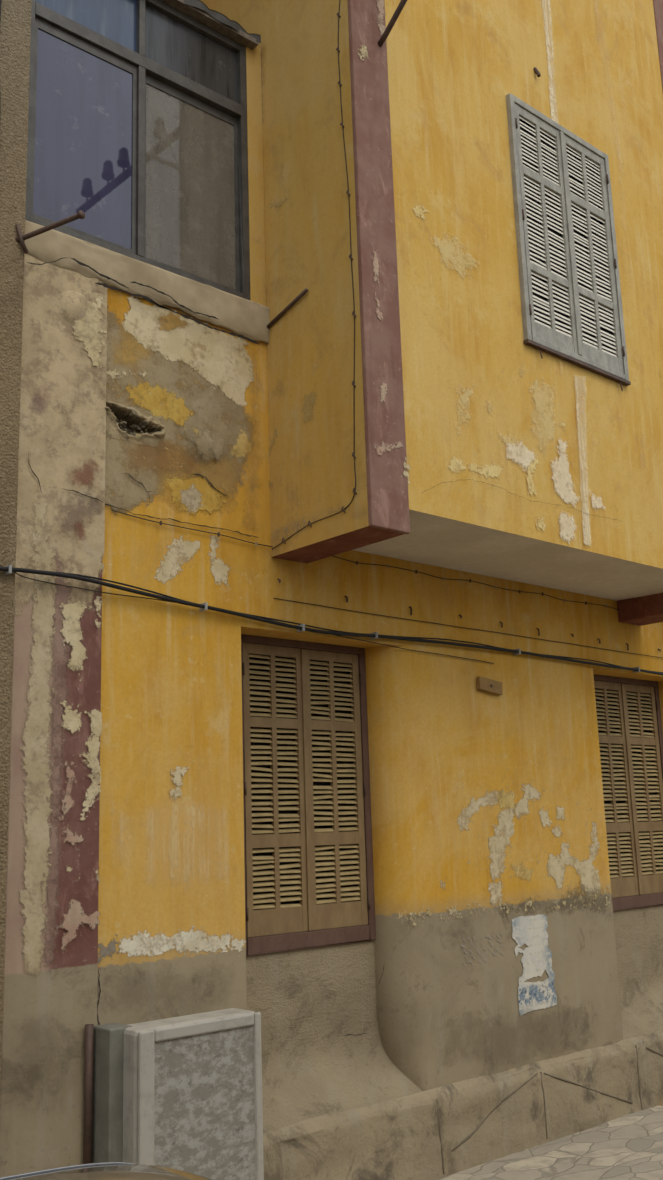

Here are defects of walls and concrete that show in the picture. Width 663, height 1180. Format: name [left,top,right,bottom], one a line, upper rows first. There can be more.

peeling [376,0,386,42]
peeling [433,234,481,278]
crack [28,452,259,538]
peeling [435,366,613,544]
peeling [14,253,254,976]
peeling [397,768,610,926]